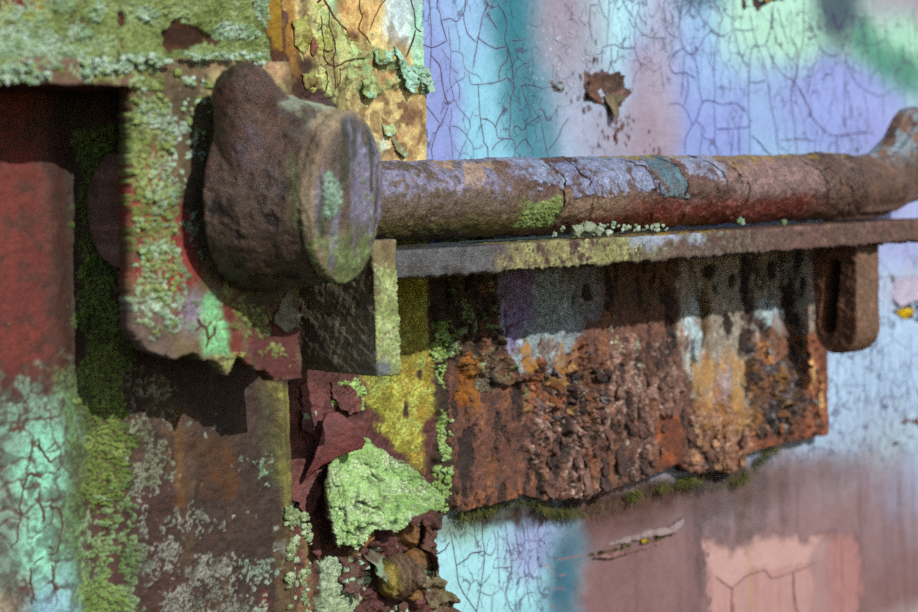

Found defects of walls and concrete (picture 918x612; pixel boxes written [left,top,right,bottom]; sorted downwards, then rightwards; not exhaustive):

crack [317,0,386,98]
peeling [373,46,436,94]
peeling [583,70,633,119]
corrosion [598,115,635,147]
peeling [742,0,783,11]
peeling [889,273,918,320]
corrosion [455,353,479,406]
corrosion [482,342,825,526]
crack [828,333,918,465]
crack [8,426,63,605]
peeling [288,381,461,612]
crack [435,501,583,612]